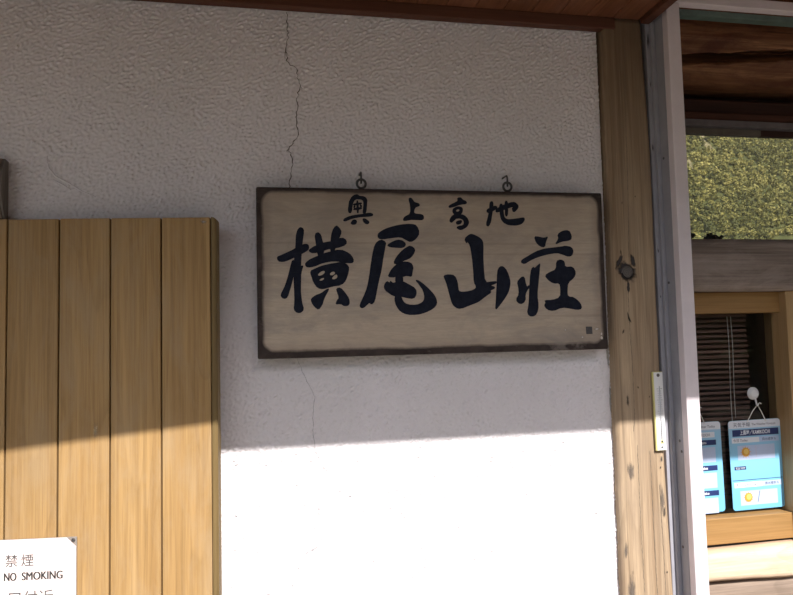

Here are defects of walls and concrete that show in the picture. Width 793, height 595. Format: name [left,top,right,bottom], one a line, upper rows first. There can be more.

crack [285,12,302,188]